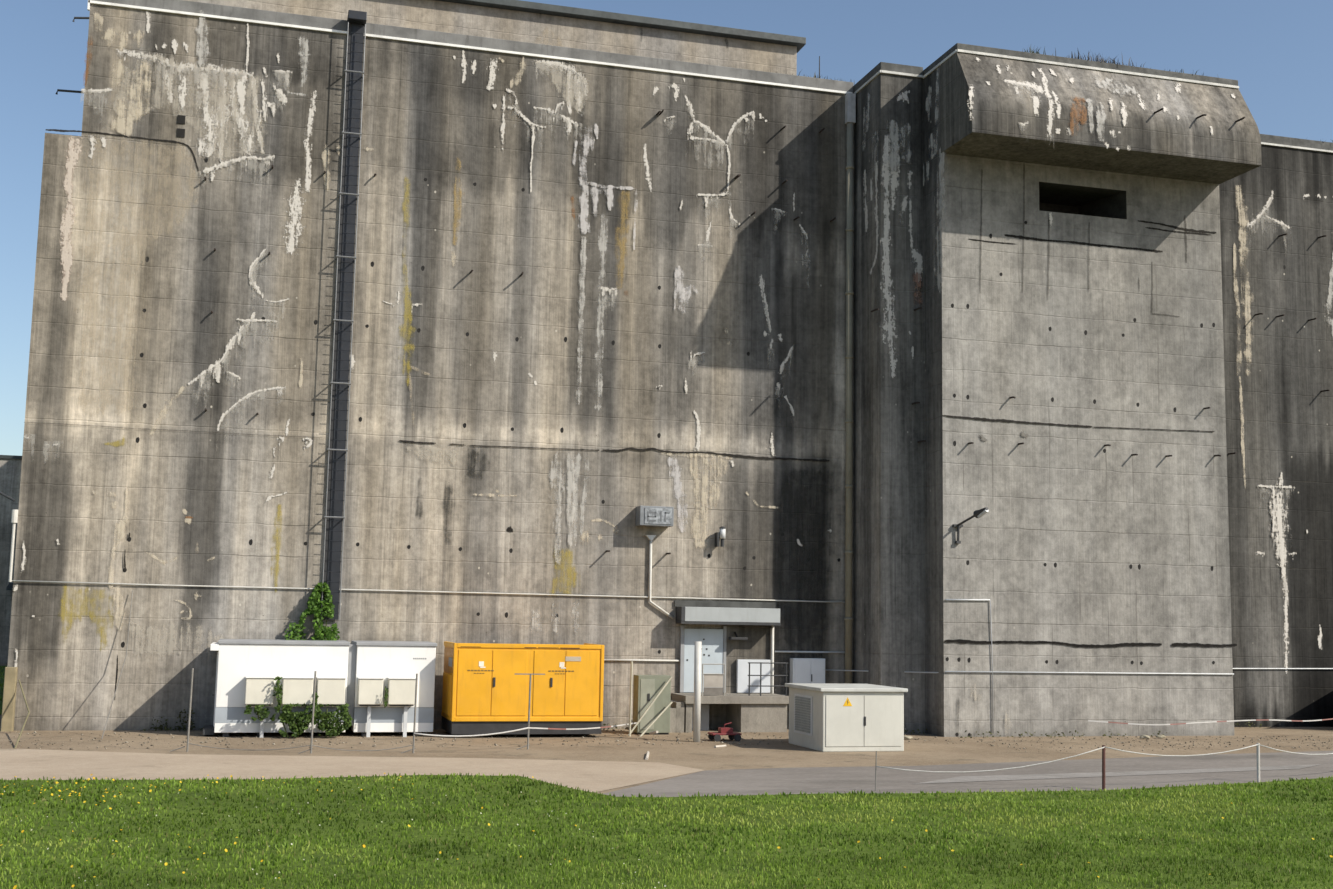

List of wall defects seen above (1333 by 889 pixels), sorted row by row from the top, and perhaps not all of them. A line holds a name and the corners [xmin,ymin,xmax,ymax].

efflorescence [60,10,339,301]
leakage [453,50,588,115]
leakage [573,124,652,411]
leakage [653,78,685,101]
leakage [674,266,697,313]
crack [656,331,730,394]
crack [758,274,794,416]
efflorescence [863,68,946,378]
leakage [108,489,222,655]
efflorescence [549,453,615,563]
crack [399,440,829,462]
efflorescence [667,410,734,547]